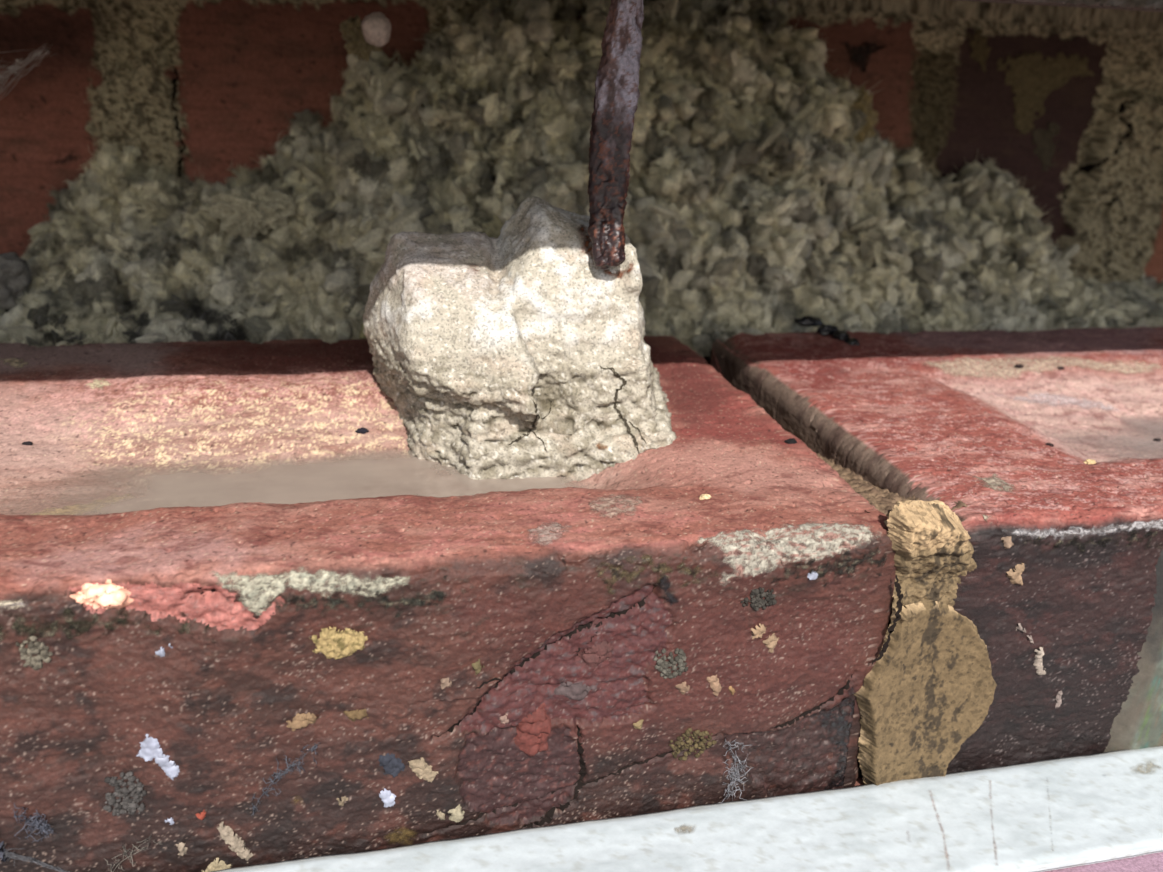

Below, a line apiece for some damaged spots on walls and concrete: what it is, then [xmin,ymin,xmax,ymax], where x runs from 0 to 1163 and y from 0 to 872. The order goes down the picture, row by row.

corrosion [579,225,593,257]
crack [509,401,552,451]
crack [600,366,647,454]
spalling [69,579,285,631]
crack [437,582,661,737]
crack [431,726,722,833]